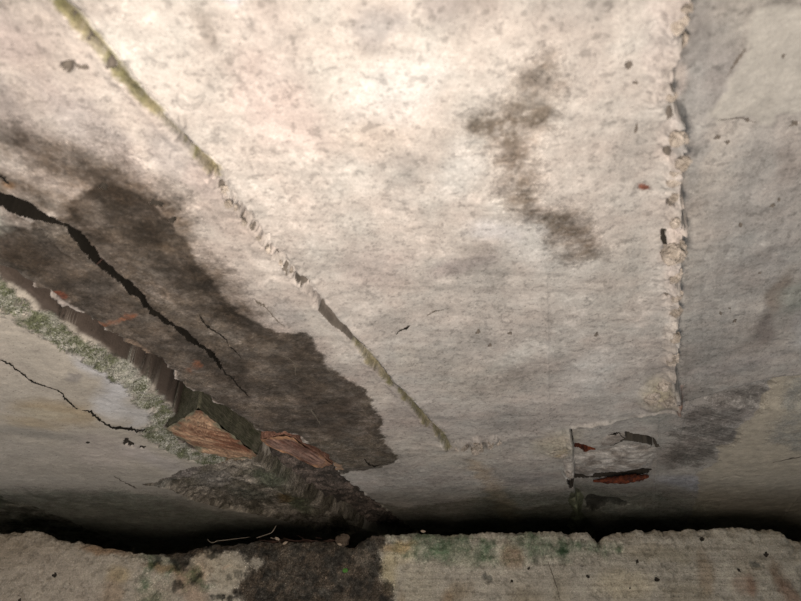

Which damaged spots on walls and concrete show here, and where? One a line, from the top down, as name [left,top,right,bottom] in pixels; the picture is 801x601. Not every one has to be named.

leakage [438,40,633,268]
crack [0,175,249,397]
leakage [0,113,403,475]
crack [1,360,150,433]
spalling [142,442,364,536]
spalling [561,429,660,488]
leakage [151,535,396,601]